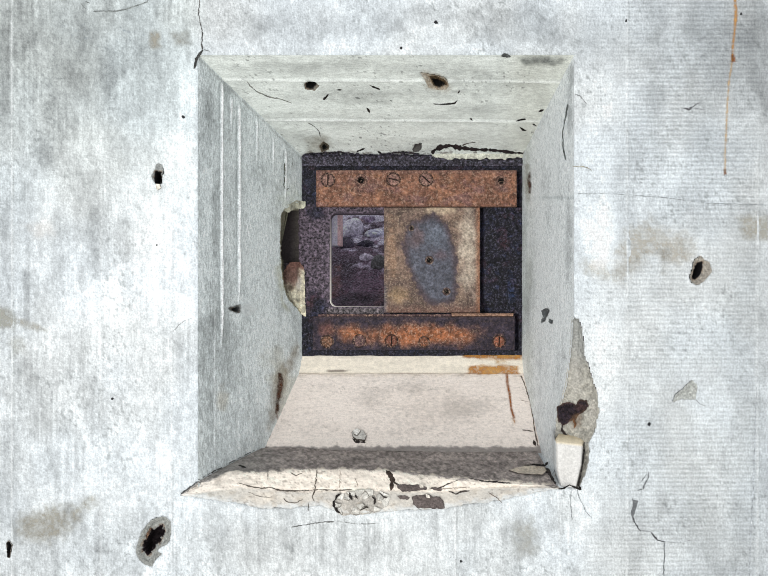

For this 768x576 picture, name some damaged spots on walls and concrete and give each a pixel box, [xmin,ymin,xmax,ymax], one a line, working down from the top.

crack [194,0,208,68]
corrosion [725,0,737,137]
spalling [280,200,306,317]
corrosion [463,355,522,423]
spalling [509,316,599,490]
spalling [136,517,171,566]
spalling [332,484,445,516]
crack [631,472,690,574]